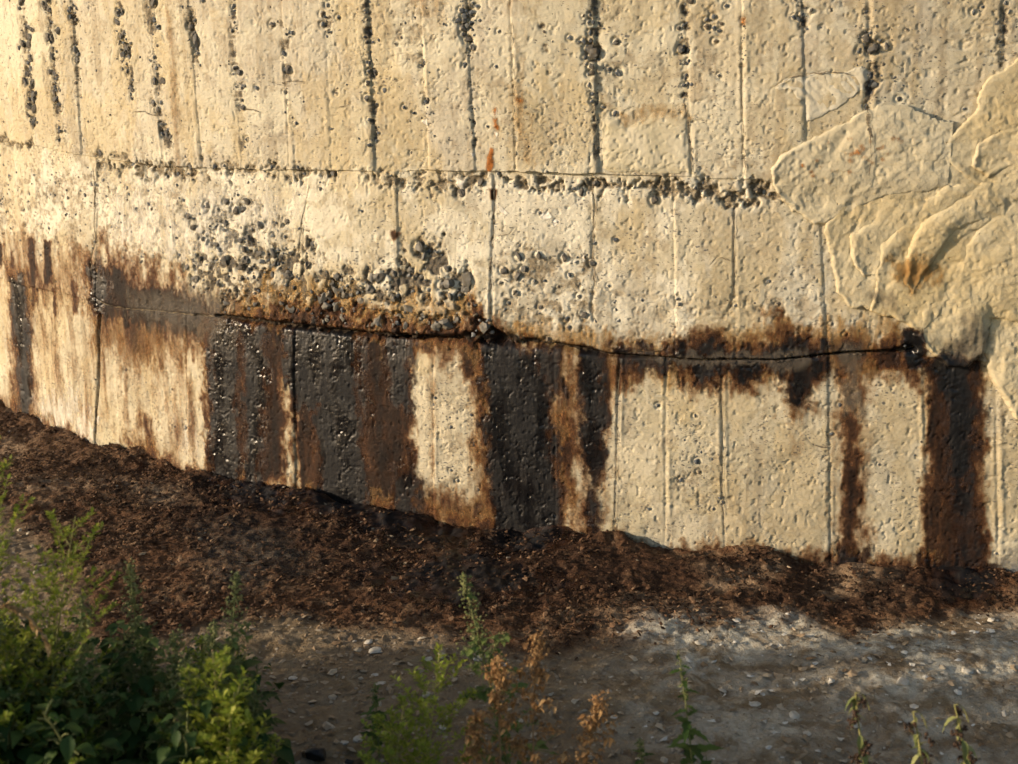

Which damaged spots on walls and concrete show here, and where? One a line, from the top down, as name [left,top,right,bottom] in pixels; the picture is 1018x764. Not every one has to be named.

water stain [0,262,99,444]
rust [221,267,659,416]
crack [90,171,910,528]
water stain [79,184,1000,569]
spalling [536,242,596,299]
rust [651,366,681,387]
rust [416,433,489,526]